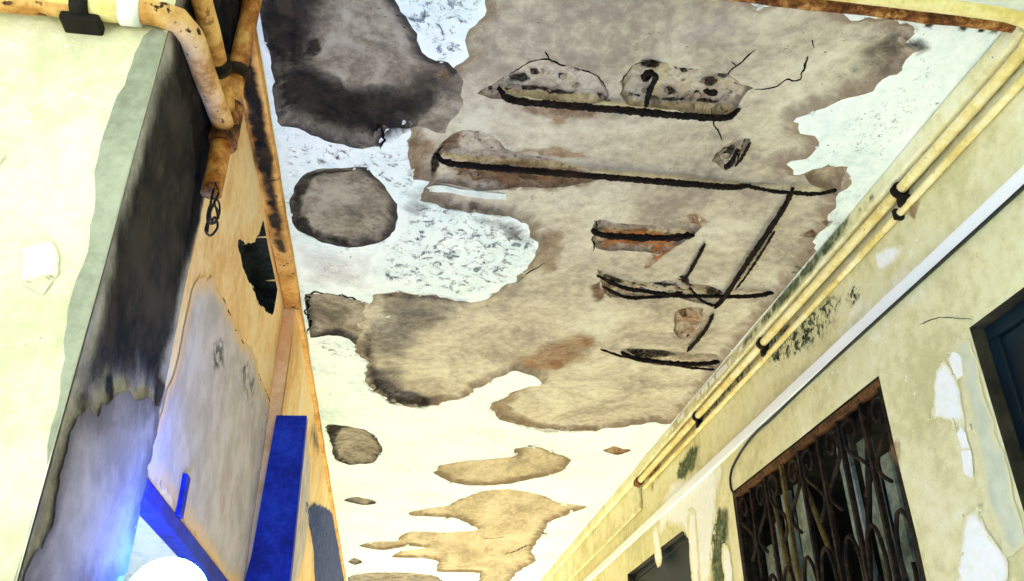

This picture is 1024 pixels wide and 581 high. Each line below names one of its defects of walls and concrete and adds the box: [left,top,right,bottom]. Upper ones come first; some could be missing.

leakage [409,0,470,59]
crack [718,50,755,74]
crack [755,39,814,90]
leakage [264,0,437,245]
leakage [91,37,209,408]
spalling [238,221,277,315]
spalling [260,0,919,437]
corrosion [601,229,671,268]
leakage [744,219,847,344]
leakage [771,286,860,362]
peeling [926,338,1024,581]